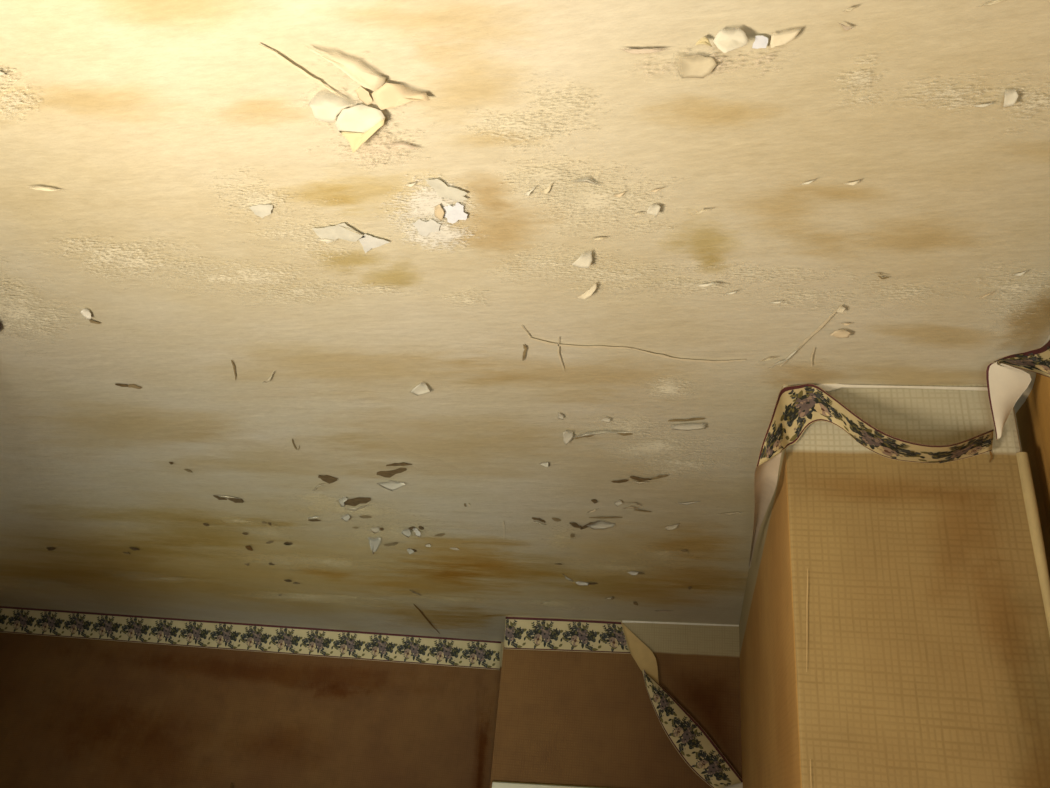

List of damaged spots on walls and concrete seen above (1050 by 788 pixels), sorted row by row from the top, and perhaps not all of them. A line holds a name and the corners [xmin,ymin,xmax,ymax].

peeling [680,28,801,78]
peeling [309,48,430,153]
flaking render [407,179,468,237]
flaking render [312,223,390,253]
peeling [315,475,337,490]
peeling [377,462,412,491]
peeling [339,497,445,554]
peeling [532,499,651,538]
peeling [621,622,659,684]